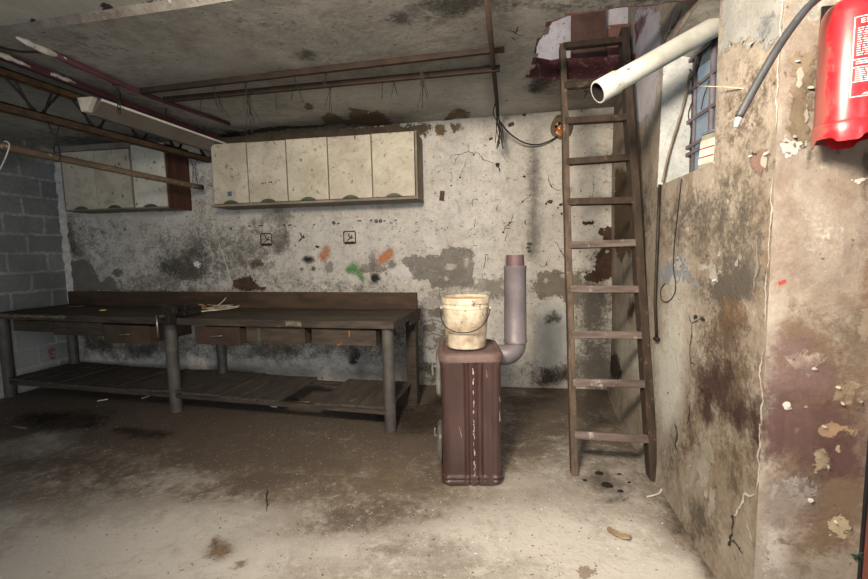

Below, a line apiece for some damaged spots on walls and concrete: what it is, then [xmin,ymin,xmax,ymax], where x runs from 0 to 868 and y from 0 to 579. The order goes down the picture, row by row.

water stain [157,246,205,280]
flaking render [231,275,267,292]
flaking render [359,245,504,351]
water stain [538,369,567,385]
flaking render [781,349,827,377]
flaking render [832,379,867,405]
water stain [698,338,866,509]
flaking render [812,421,858,474]
flaking render [827,514,853,539]